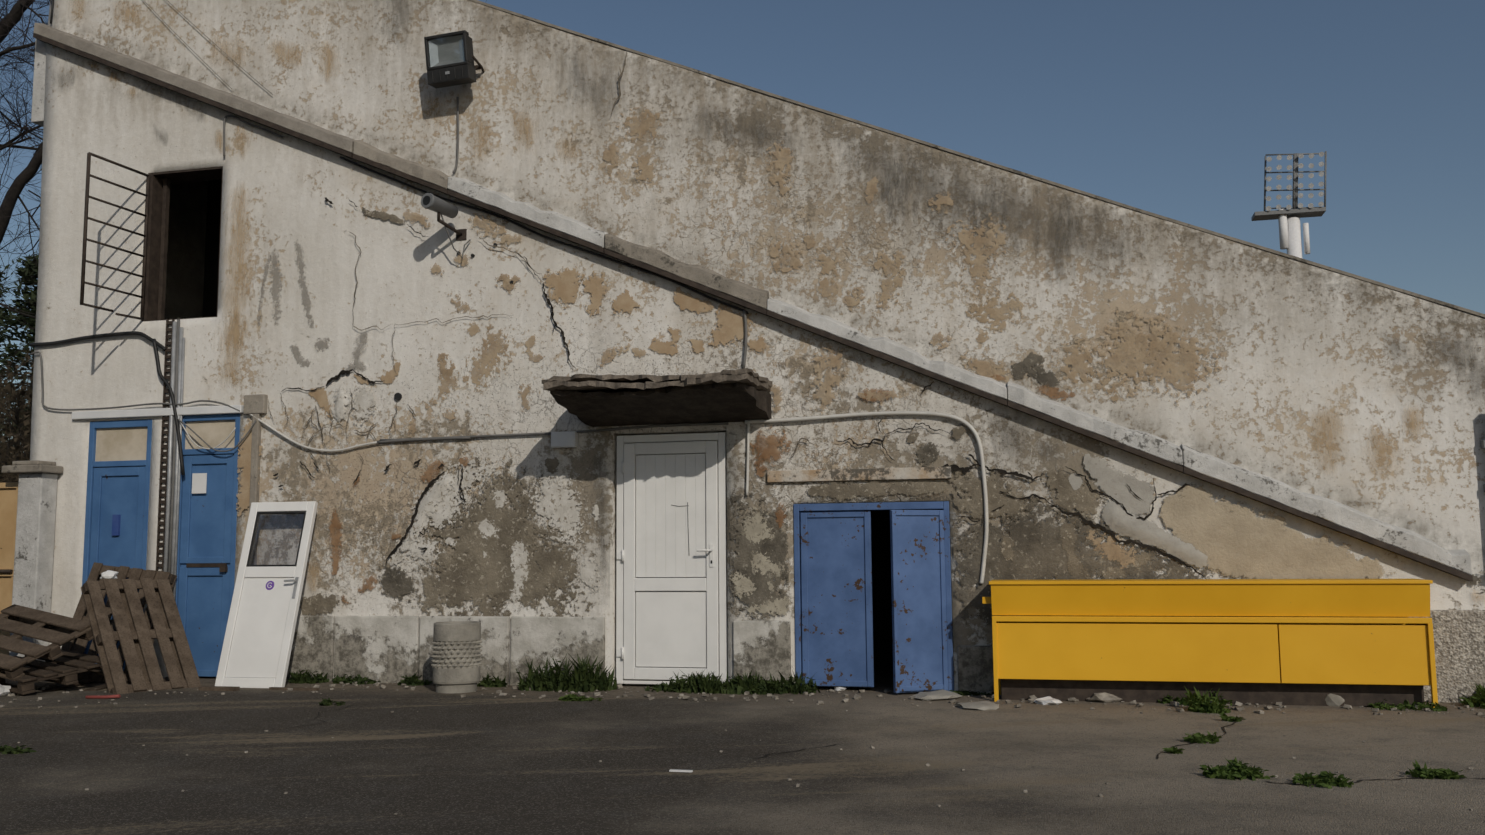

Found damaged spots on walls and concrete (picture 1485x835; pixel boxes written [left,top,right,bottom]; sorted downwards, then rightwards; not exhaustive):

crack [268,197,512,563]
peeling [430,250,472,275]
peeling [495,274,521,295]
crack [479,237,574,367]
peeling [539,264,641,318]
peeling [597,287,767,367]
flaking render [378,455,601,617]
crack [791,381,1206,579]
flaking render [807,423,1398,625]
flaking render [299,593,340,616]